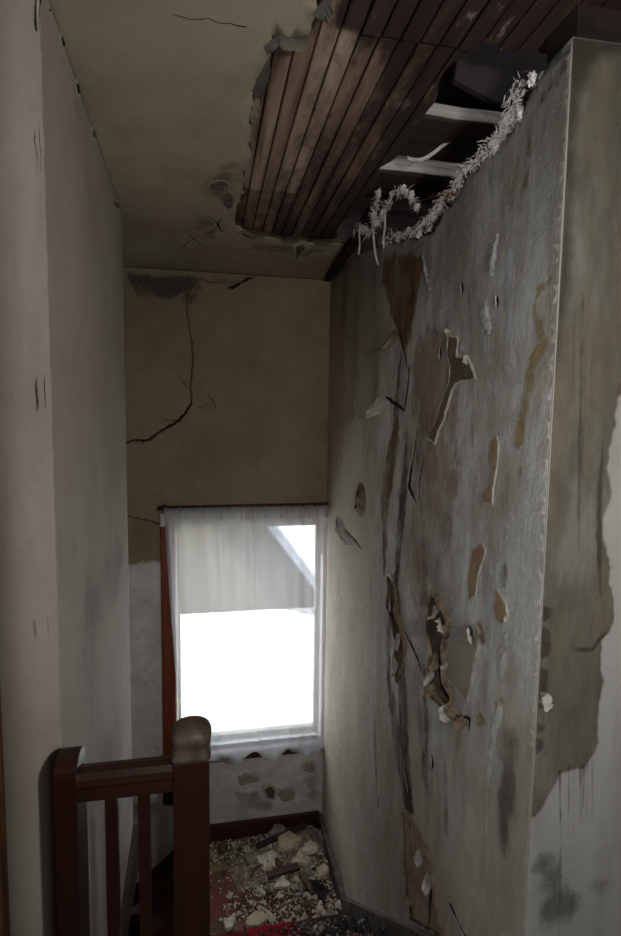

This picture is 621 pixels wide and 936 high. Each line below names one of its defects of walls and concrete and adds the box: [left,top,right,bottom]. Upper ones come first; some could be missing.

crack [174,14,247,27]
crack [126,277,216,446]
peeling [426,328,477,445]
damp [536,37,621,780]
peeling [482,435,500,506]
peeling [335,516,362,550]
peeling [468,542,486,601]
peeling [386,574,407,685]
peeling [421,588,484,721]
peeling [237,772,297,802]
damp [531,785,546,817]
peeling [402,808,444,936]